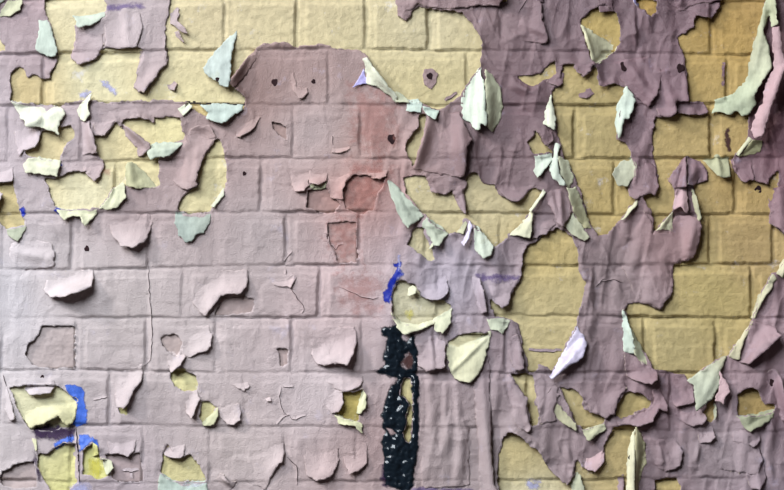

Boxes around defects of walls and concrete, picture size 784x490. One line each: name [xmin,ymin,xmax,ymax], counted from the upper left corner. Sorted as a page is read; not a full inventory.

peeling [10,0,503,248]
peeling [0,167,26,242]
peeling [387,0,784,490]
peeling [43,269,94,298]
peeling [25,325,76,369]
peeling [161,270,254,426]
peeling [311,326,357,366]
peeling [114,364,143,415]
peeling [324,375,367,433]
peeling [0,381,143,490]
peeling [158,443,208,490]
peeling [304,443,367,481]